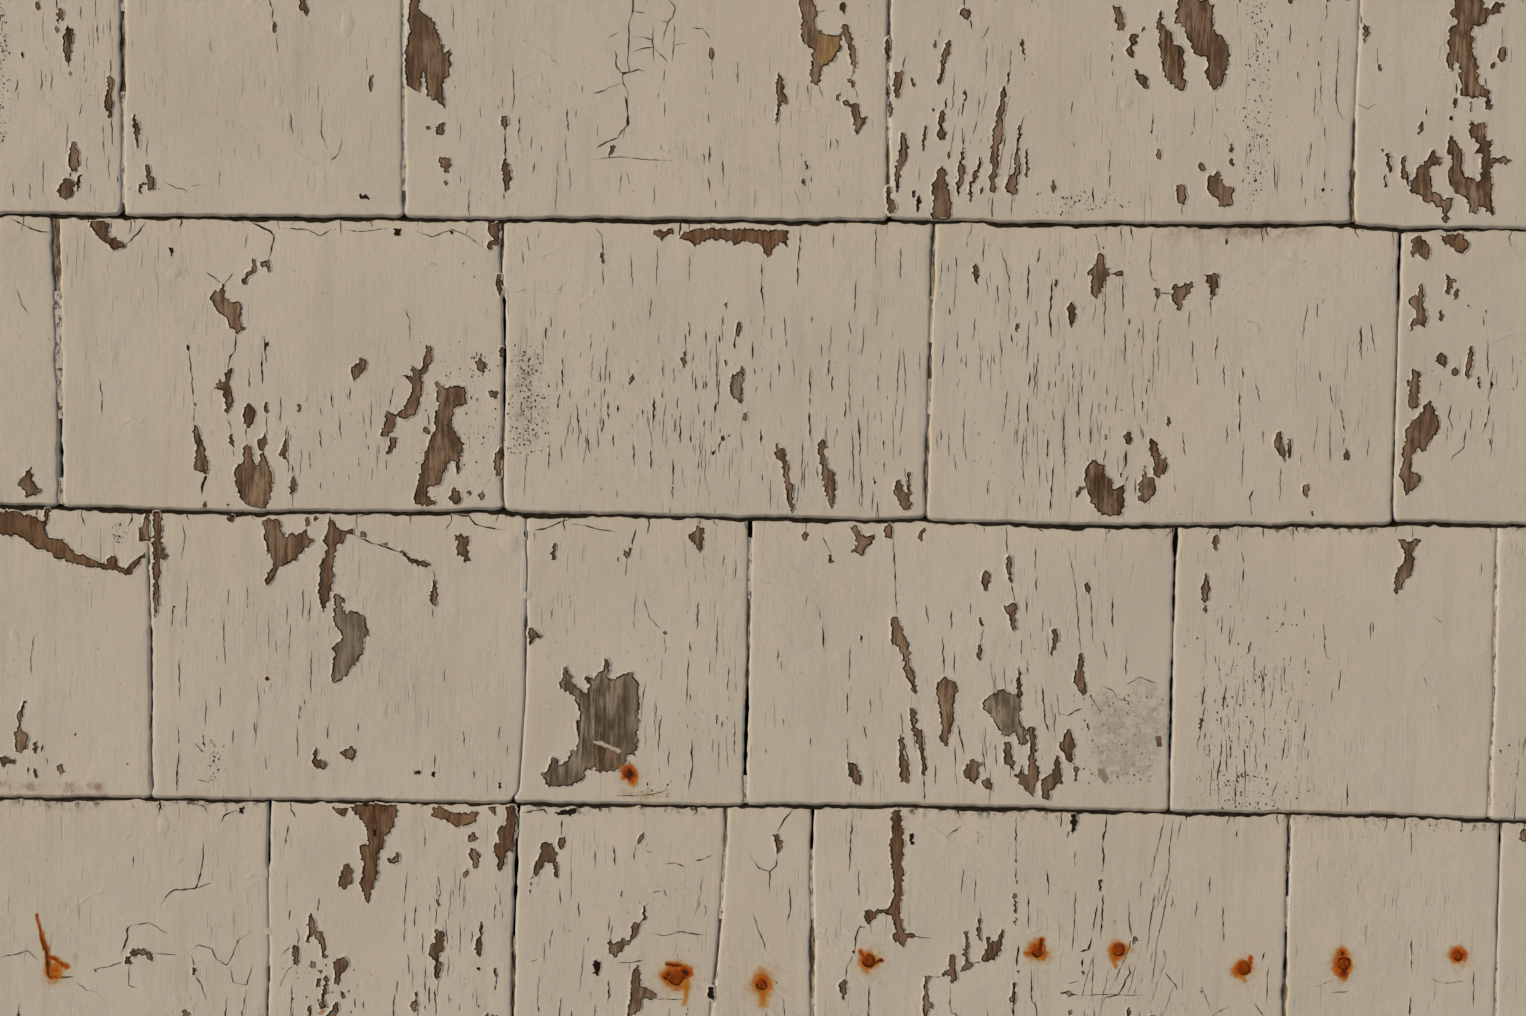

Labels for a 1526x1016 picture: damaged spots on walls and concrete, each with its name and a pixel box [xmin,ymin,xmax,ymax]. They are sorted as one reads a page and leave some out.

peeling [402,0,452,137]
peeling [1111,0,1232,93]
peeling [378,345,505,508]
peeling [207,273,439,685]
peeling [0,466,175,618]
peeling [539,657,642,789]
rust [35,913,69,983]
rust [659,961,693,1006]
rust [858,949,884,973]
rust [1023,937,1048,961]
rust [1230,955,1253,983]
rust [1332,947,1352,982]